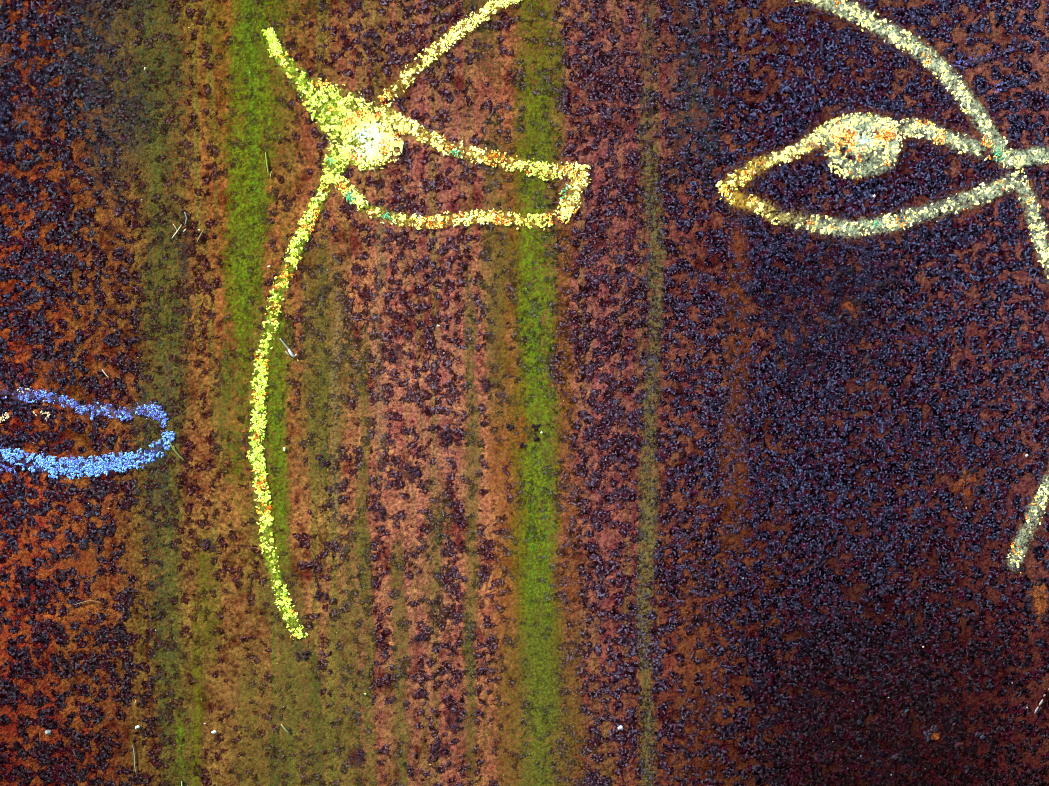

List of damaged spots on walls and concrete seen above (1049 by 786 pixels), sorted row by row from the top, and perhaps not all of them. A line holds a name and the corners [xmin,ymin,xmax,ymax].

corrosion [11,97,53,171]
corrosion [28,353,67,394]
corrosion [506,417,541,448]
corrosion [952,465,982,496]
corrosion [49,539,98,580]
corrosion [1023,579,1049,622]
corrosion [923,717,958,742]